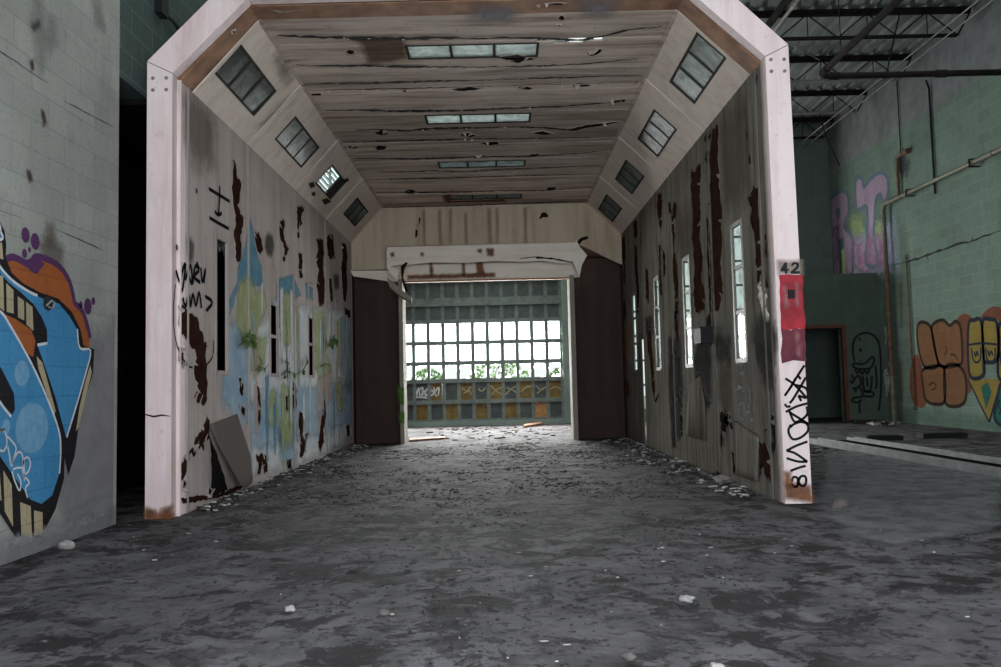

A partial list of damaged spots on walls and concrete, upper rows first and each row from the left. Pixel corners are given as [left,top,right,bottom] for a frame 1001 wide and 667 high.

crack [277,24,667,208]
peeling [231,159,244,264]
peeling [254,231,264,256]
peeling [690,123,724,326]
peeling [747,184,770,323]
crack [892,231,1000,266]
peeling [178,304,210,492]